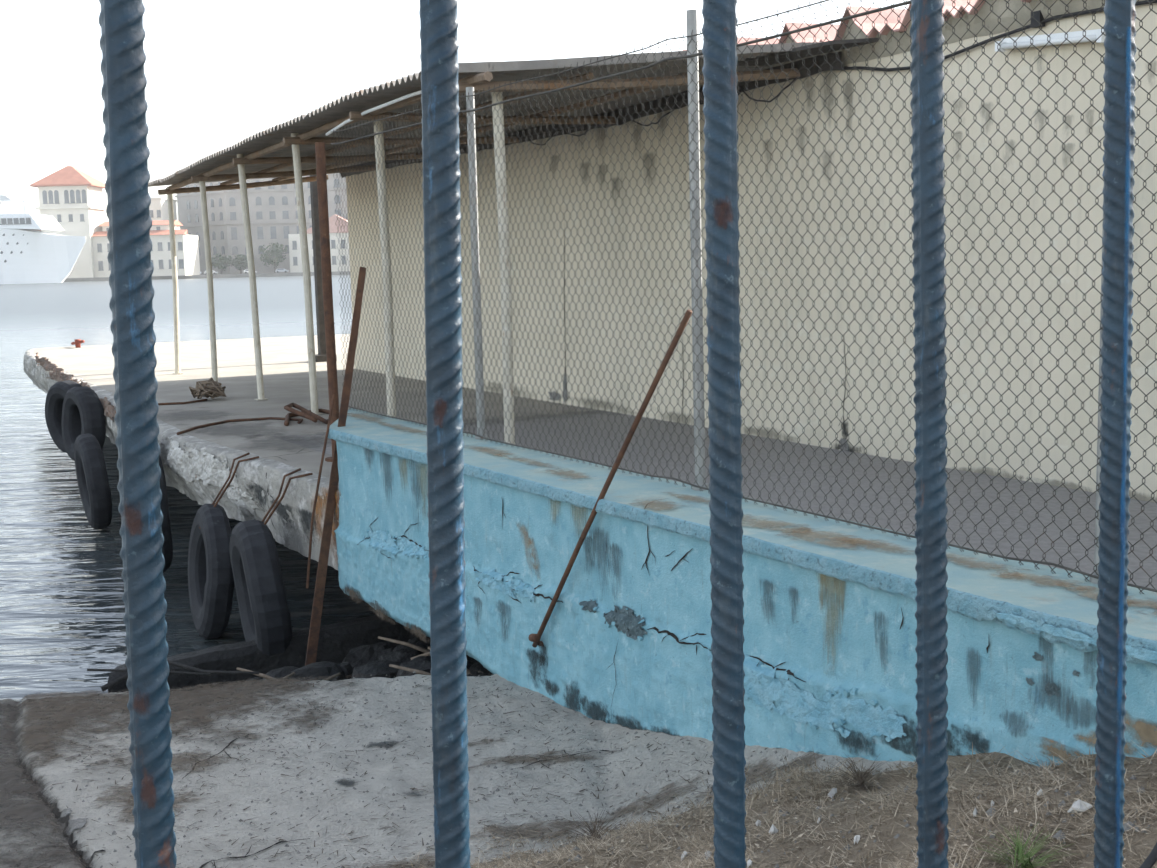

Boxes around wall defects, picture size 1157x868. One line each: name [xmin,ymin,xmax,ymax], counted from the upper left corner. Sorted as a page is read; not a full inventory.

spalling [160,437,265,516]
flaking render [363,529,429,559]
crack [641,498,693,576]
water stain [527,645,676,736]
spalling [579,599,647,641]
crack [647,627,711,655]
crack [750,656,806,682]
flaking render [743,655,907,742]